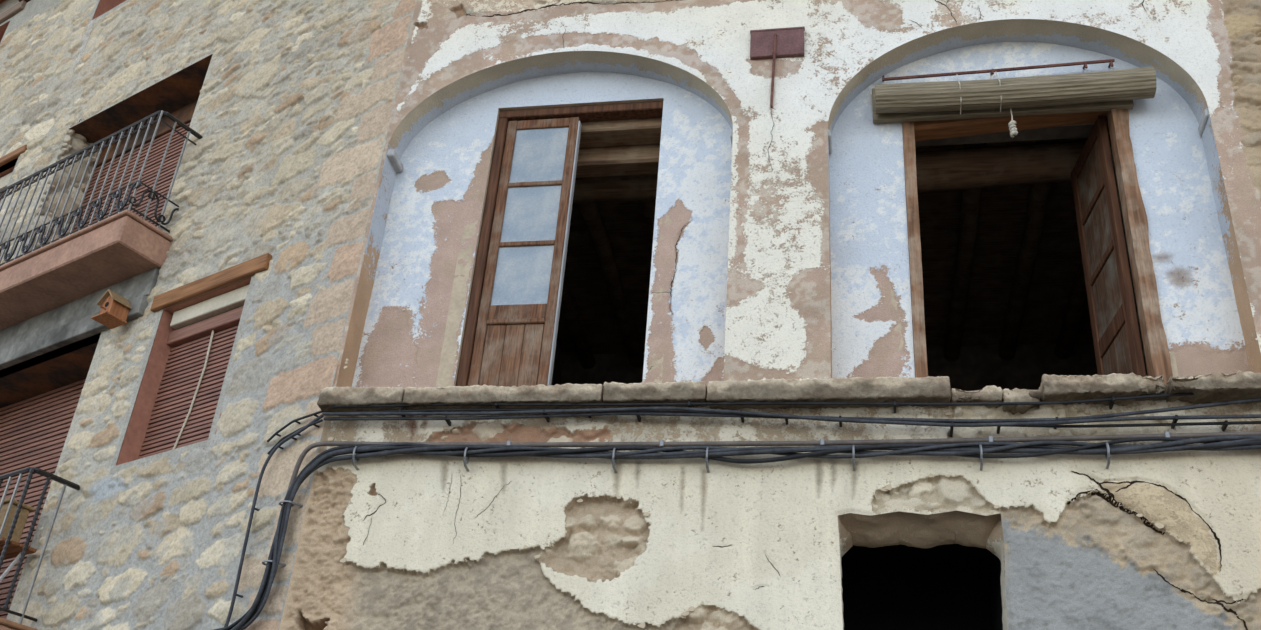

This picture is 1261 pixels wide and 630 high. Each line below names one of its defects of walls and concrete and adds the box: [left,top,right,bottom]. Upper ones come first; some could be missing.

crack [466,0,678,49]
peeling [745,58,804,78]
peeling [831,0,903,31]
peeling [369,0,761,307]
peeling [359,141,493,388]
peeling [646,200,693,383]
peeling [698,122,833,386]
peeling [849,268,907,378]
spalling [279,467,759,630]
spalling [871,473,1261,630]
crack [1067,471,1222,568]
crack [1154,569,1248,630]